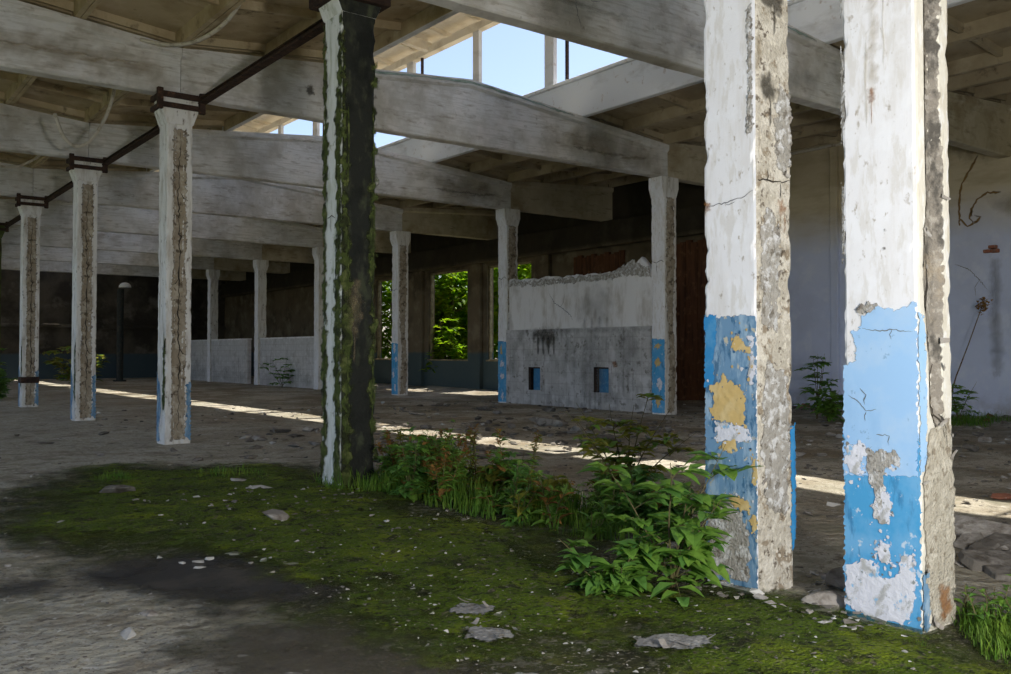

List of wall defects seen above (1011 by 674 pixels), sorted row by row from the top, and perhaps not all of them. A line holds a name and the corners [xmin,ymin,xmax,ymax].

leakage [534,329,554,354]
spalling [508,226,651,312]
spalling [654,197,676,413]
spalling [759,207,783,333]
spalling [843,0,958,632]
spalling [706,322,797,582]